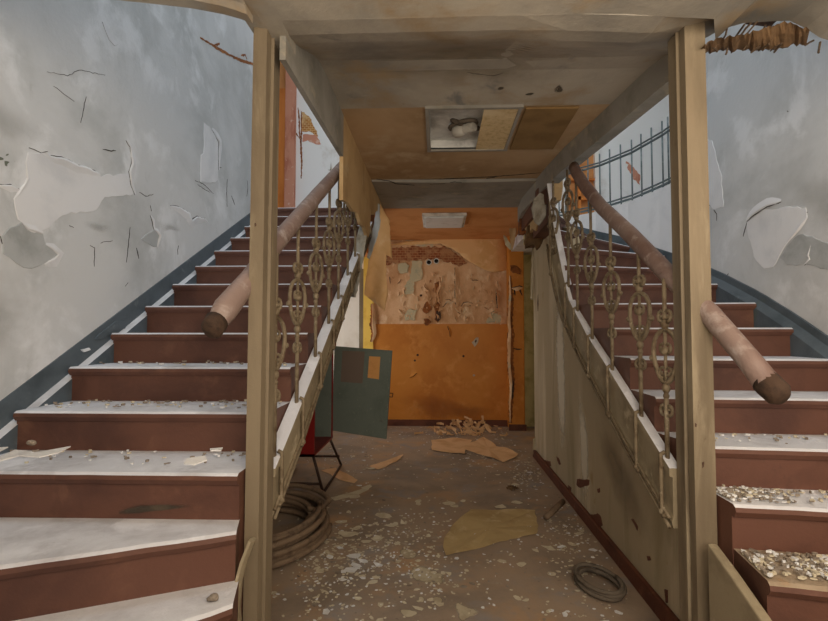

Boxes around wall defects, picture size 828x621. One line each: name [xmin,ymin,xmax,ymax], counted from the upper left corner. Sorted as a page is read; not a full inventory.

peeling [701,21,821,55]
crack [49,70,103,123]
crack [30,148,101,177]
peeling [2,152,133,269]
crack [90,230,139,267]
crack [103,140,208,230]
peeling [200,123,218,183]
peeling [708,140,724,210]
peeling [747,206,828,270]
flaking render [386,242,467,325]
peeling [486,265,521,423]